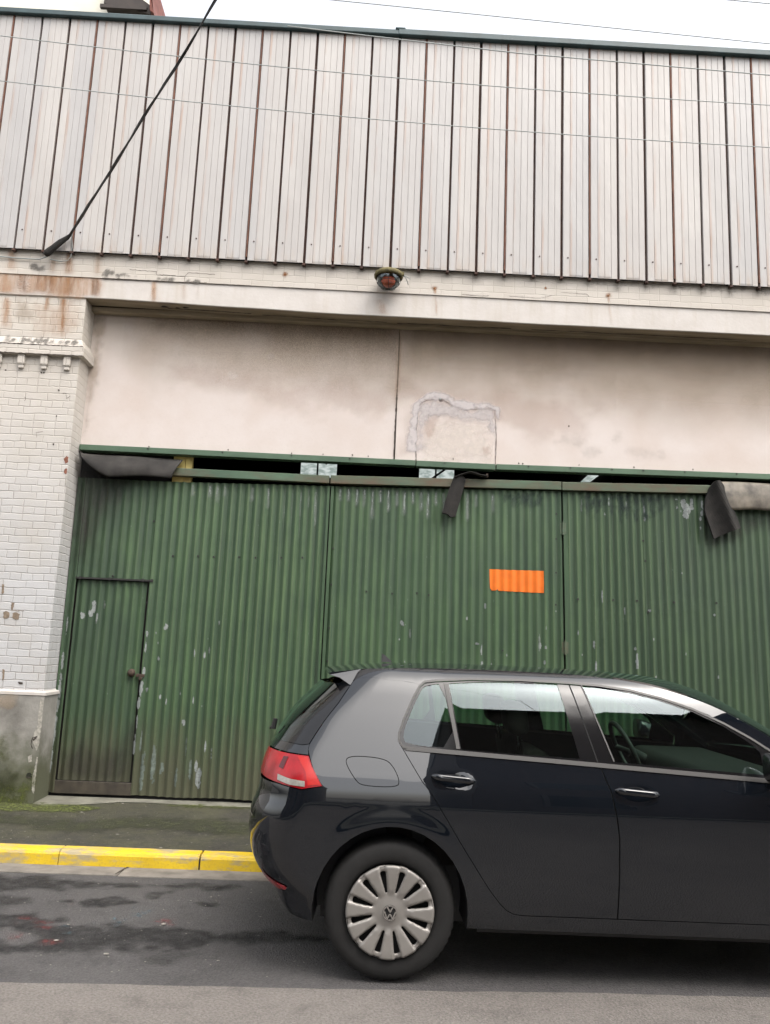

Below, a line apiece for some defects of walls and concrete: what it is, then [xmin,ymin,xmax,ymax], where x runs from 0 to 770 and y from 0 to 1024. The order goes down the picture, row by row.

flaking render [407,392,499,455]
peeling [675,498,703,530]
peeling [80,600,106,622]
peeling [133,667,212,791]